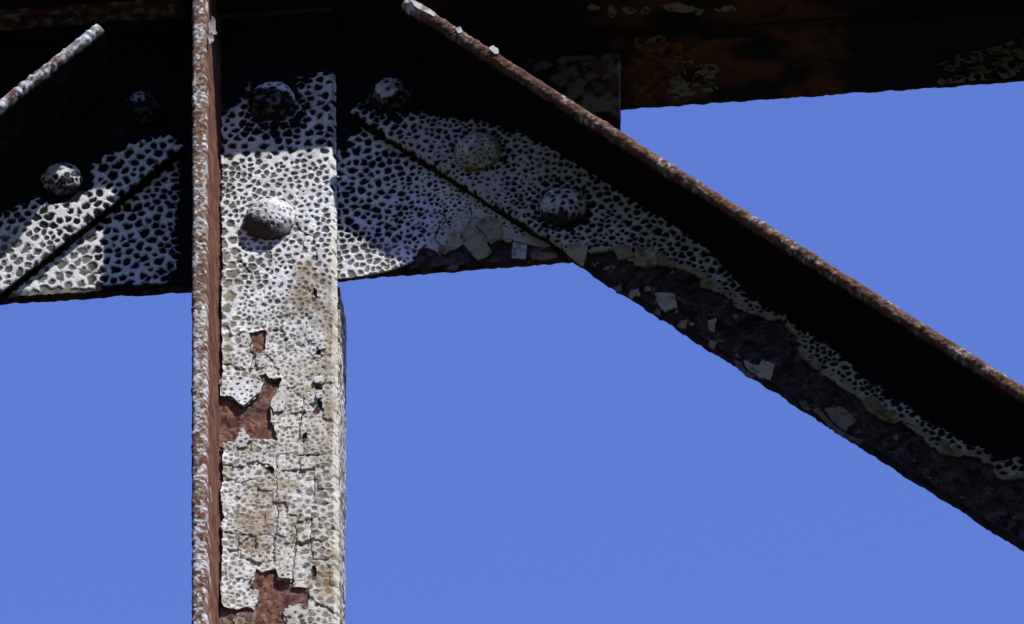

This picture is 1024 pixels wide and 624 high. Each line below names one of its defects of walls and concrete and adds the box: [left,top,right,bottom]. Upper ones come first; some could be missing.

peeling [240,331,267,354]
peeling [219,375,286,449]
peeling [410,218,1024,543]
crack [221,400,331,584]
peeling [220,567,317,624]